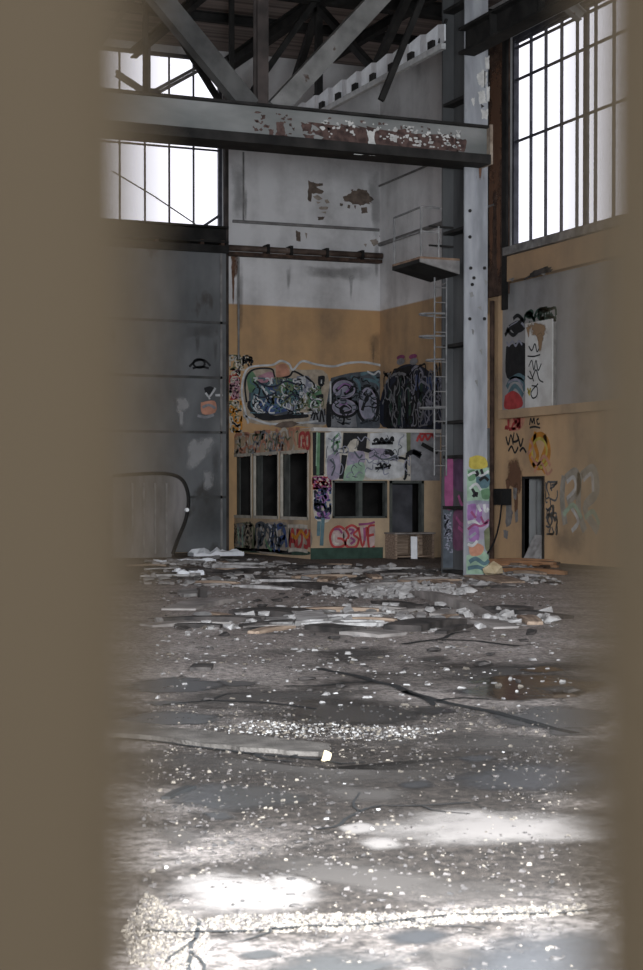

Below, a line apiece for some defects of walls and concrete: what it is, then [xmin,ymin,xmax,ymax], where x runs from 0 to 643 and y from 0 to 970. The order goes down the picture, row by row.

peeling [308,181,374,220]